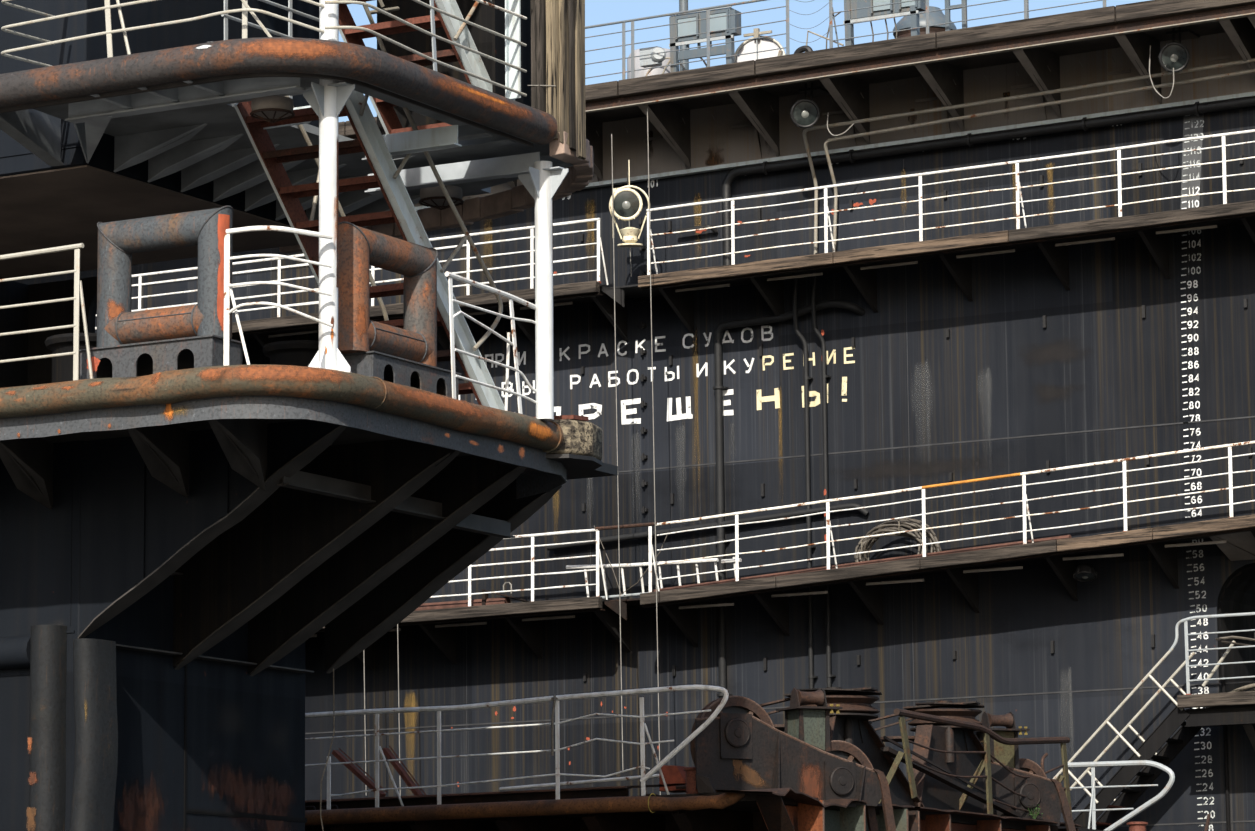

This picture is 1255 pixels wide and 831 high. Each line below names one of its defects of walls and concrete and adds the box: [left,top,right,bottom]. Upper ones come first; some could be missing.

rust [242,39,337,58]
rust [108,301,123,319]
rust [164,404,184,419]
rust [397,386,493,418]
rust [733,759,764,787]
rust [801,766,821,800]
rust [26,808,36,831]